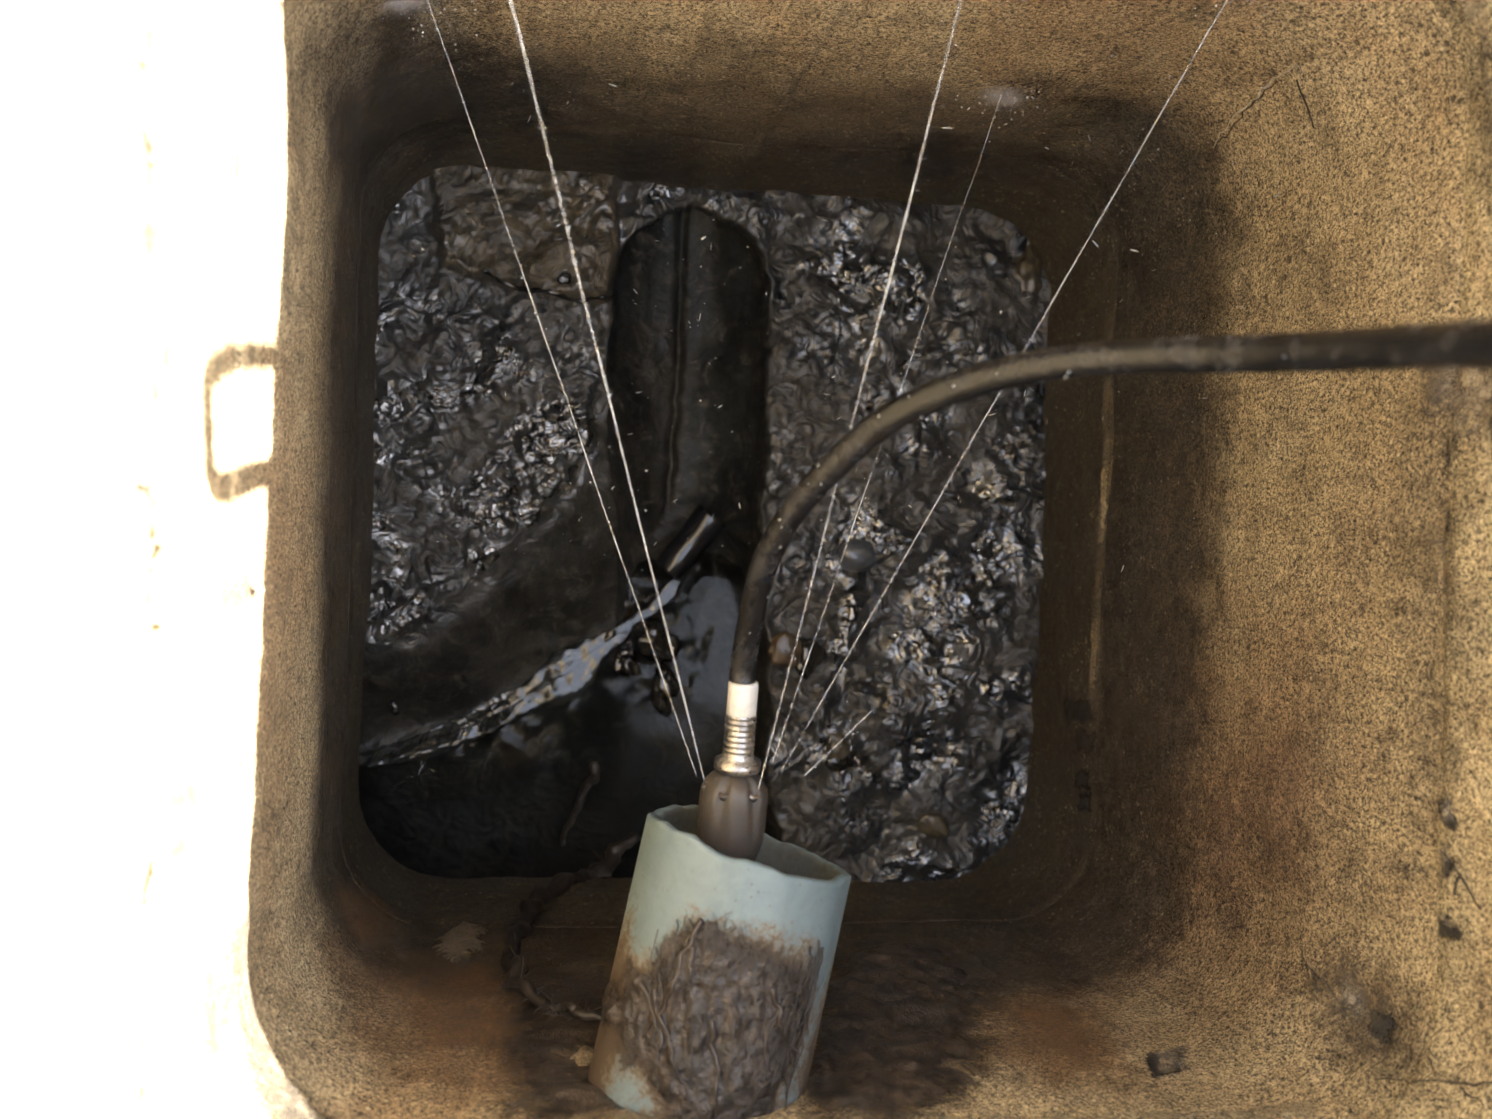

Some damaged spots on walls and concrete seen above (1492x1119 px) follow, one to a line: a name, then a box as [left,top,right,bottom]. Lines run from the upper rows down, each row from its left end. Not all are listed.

crack [1300,948,1340,1003]
crack [1374,1078,1492,1107]